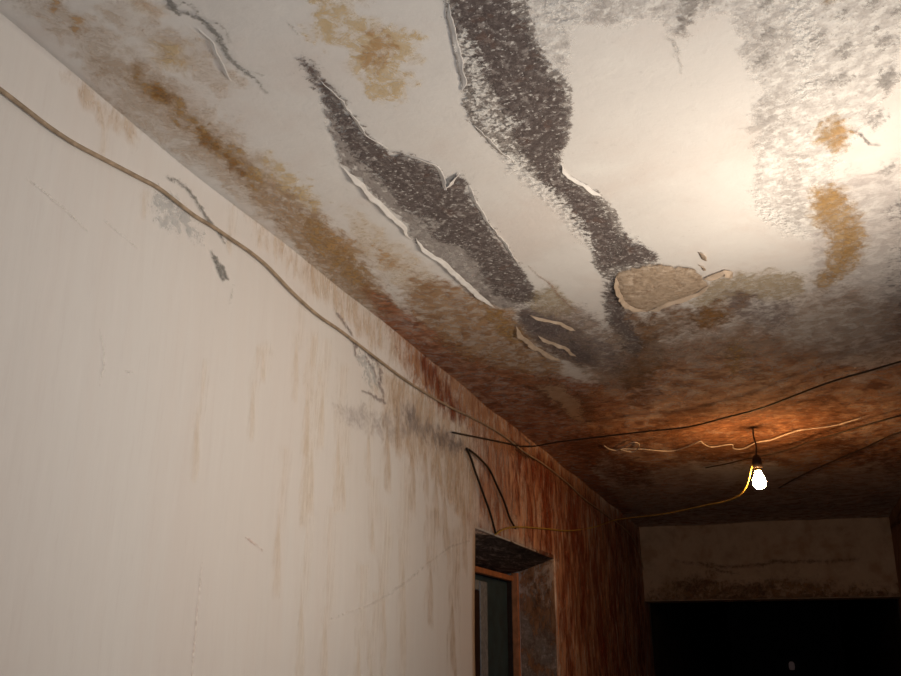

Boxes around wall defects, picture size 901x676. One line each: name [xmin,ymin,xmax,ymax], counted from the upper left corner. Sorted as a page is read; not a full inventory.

crack [166,0,268,94]
leakage [309,0,421,100]
spalling [296,0,733,368]
leakage [527,0,901,365]
crack [338,314,386,403]
rust [124,66,901,514]
leakage [523,282,630,378]